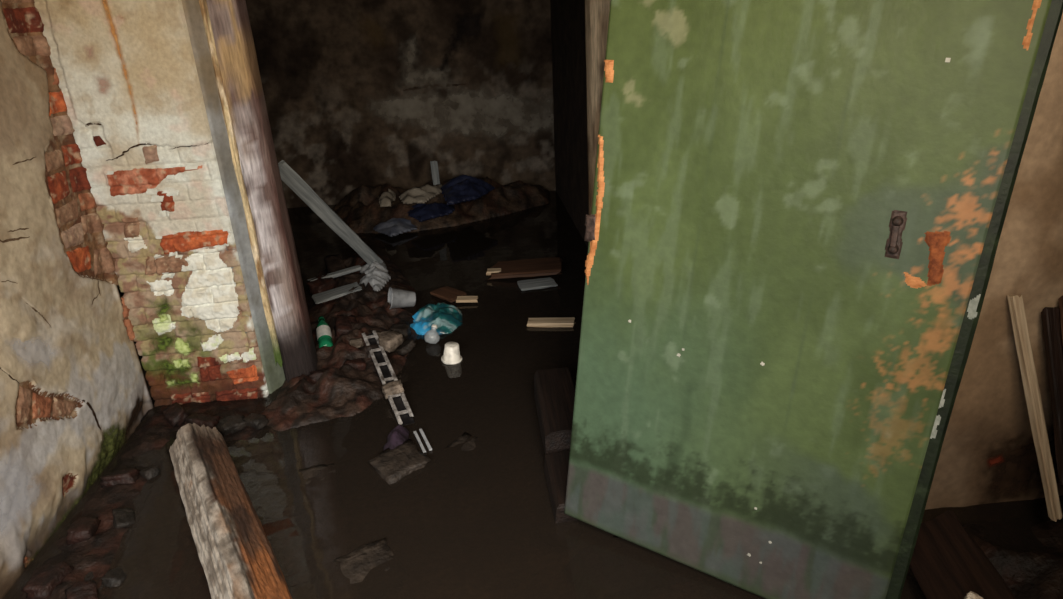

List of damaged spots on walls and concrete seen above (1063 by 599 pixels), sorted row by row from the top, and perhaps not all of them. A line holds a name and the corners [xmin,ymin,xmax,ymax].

corrosion [103,0,137,124]
spalling [0,0,135,342]
peeling [106,145,203,217]
crack [106,143,208,161]
peeling [121,217,259,405]
crack [0,364,19,383]
spalling [14,377,83,435]